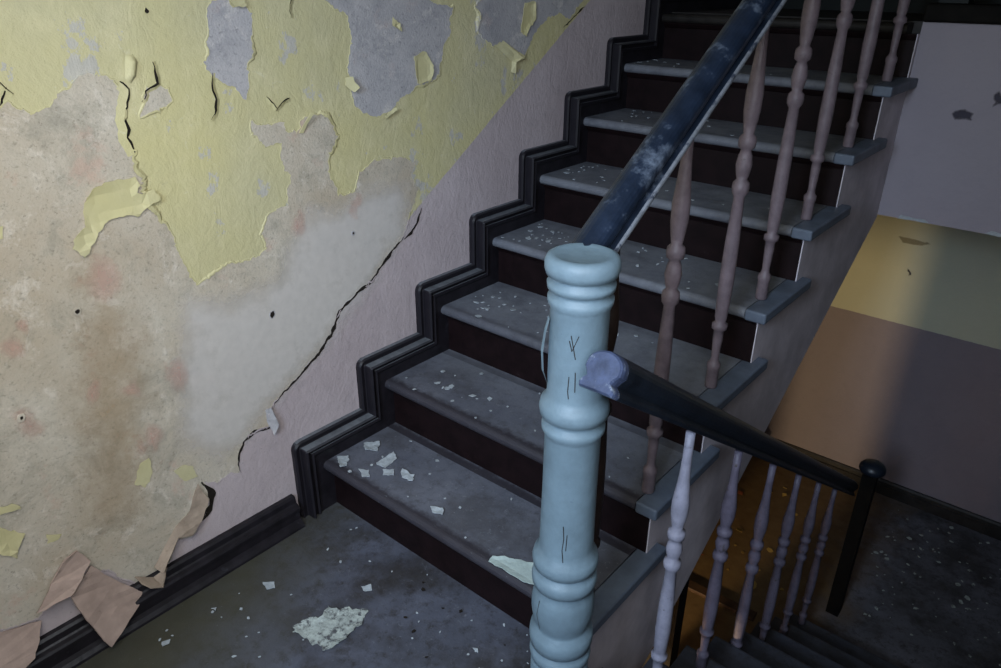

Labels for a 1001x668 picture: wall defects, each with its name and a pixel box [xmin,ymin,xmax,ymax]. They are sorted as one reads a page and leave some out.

peeling [203,0,257,101]
peeling [324,0,455,119]
peeling [474,0,584,74]
peeling [0,72,419,632]
leakage [184,192,403,448]
crack [238,208,422,470]